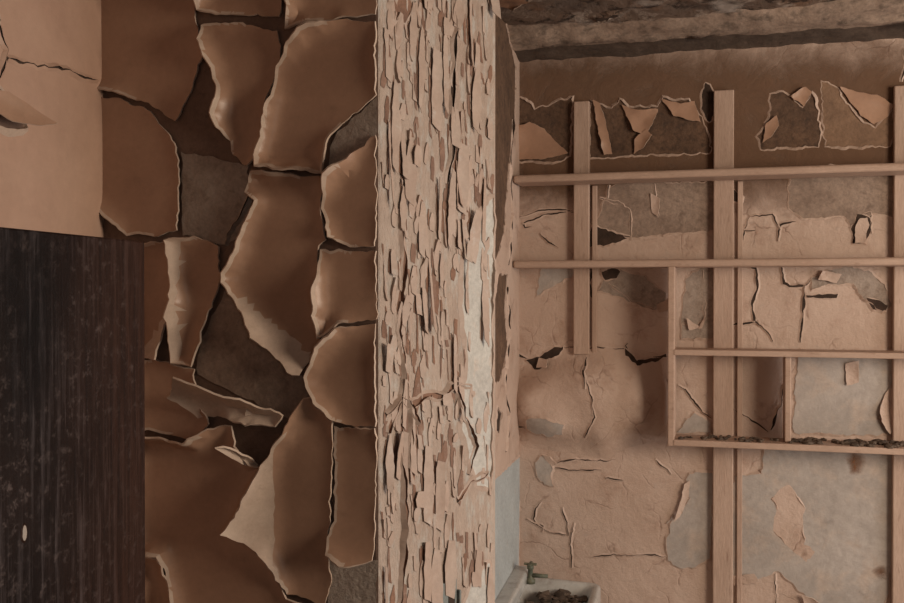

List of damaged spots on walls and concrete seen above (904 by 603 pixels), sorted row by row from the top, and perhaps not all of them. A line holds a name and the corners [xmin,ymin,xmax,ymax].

peeling [0,85,58,137]
peeling [590,82,714,159]
peeling [755,81,893,151]
peeling [97,0,574,603]
crack [554,342,668,482]
crack [677,384,712,420]
crack [733,384,783,433]
peeling [791,347,892,439]
crack [654,458,672,475]
crack [526,501,667,568]
peeling [663,469,713,570]
peeling [733,449,892,603]